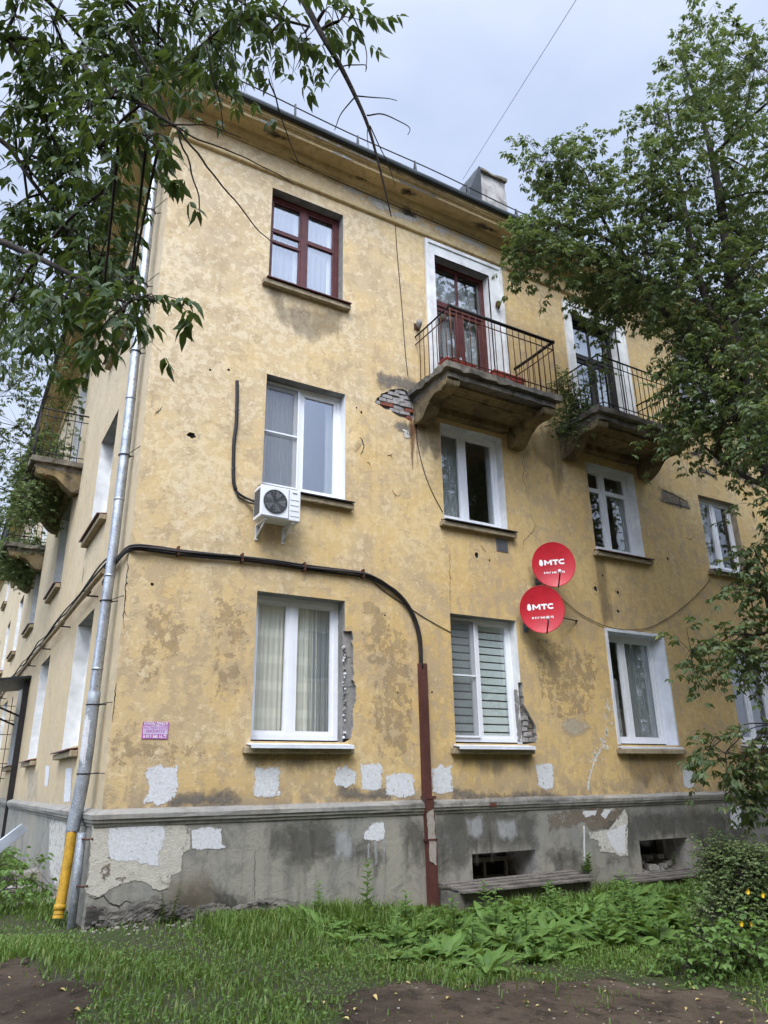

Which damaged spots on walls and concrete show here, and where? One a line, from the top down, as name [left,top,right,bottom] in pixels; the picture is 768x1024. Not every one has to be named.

flaking render [375,373,417,438]
flaking render [338,608,356,739]
flaking render [514,683,537,743]
peeling [548,807,628,857]
peeling [84,824,303,930]